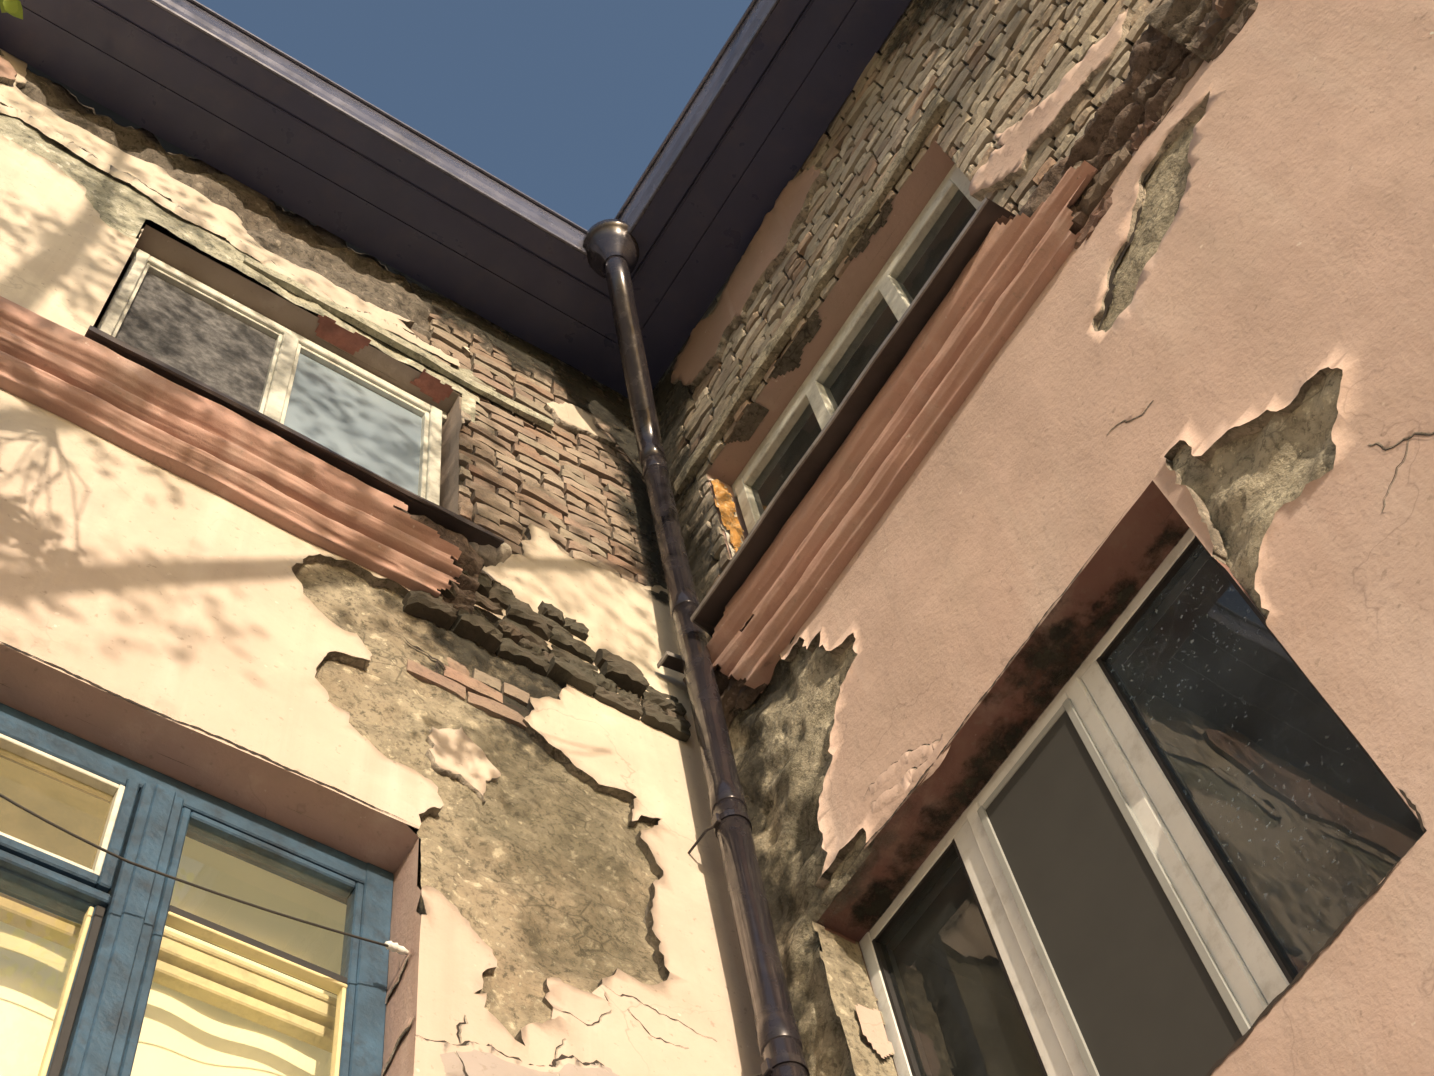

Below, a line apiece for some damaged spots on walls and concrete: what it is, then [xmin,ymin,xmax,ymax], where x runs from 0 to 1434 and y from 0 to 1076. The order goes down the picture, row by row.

flaking render [0,562,663,1038]